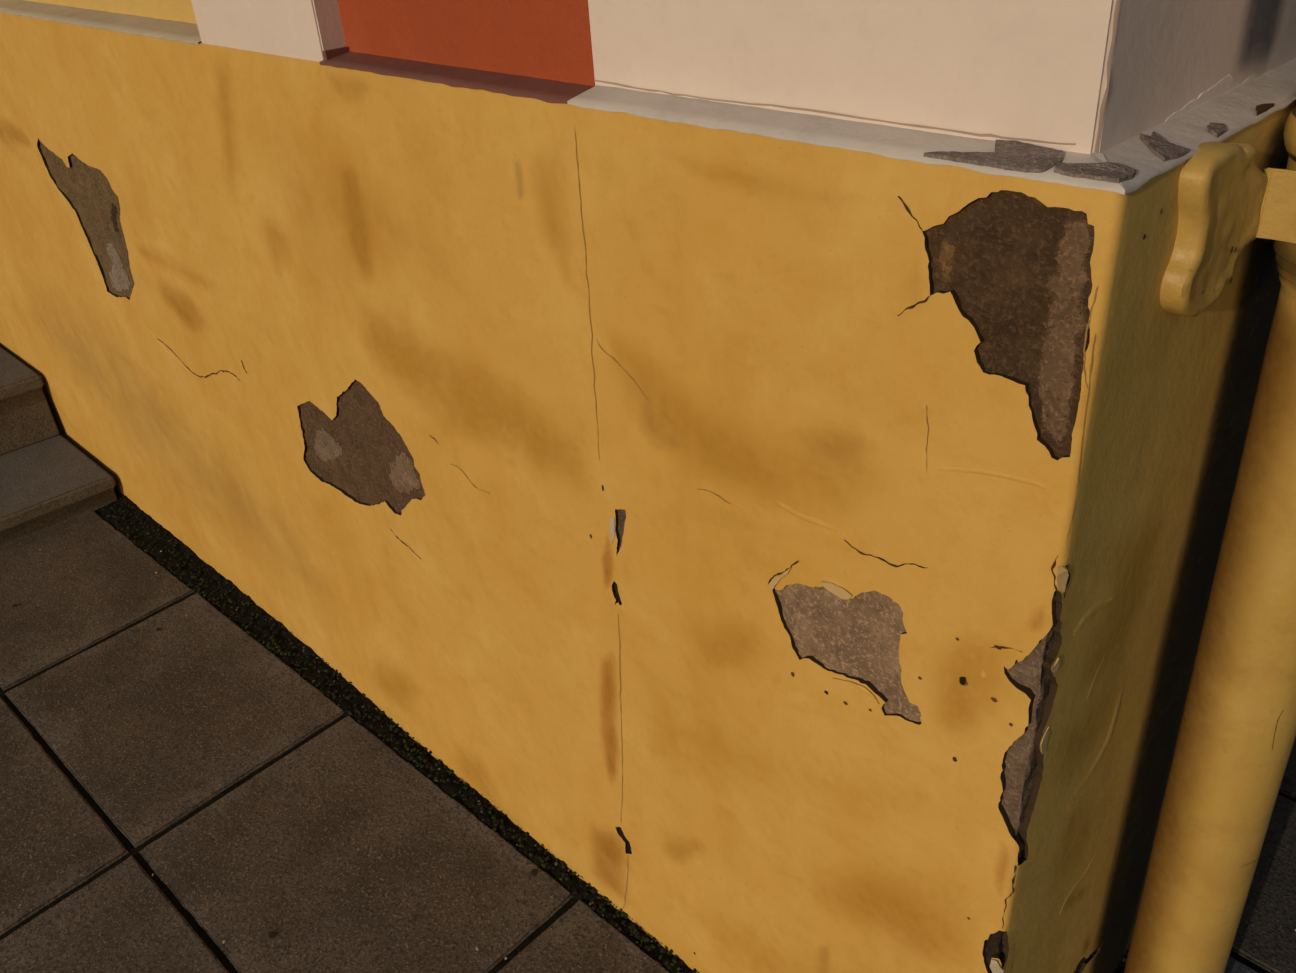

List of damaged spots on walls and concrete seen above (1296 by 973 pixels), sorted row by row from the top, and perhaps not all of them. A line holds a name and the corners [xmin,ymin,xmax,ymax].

spalling [39,140,135,298]
spalling [923,140,1136,183]
crack [156,338,247,380]
spalling [925,190,1094,458]
spalling [300,380,425,513]
spalling [610,509,626,550]
crack [844,540,925,568]
spalling [767,567,921,722]
spalling [1002,566,1069,859]
spalling [985,930,1004,973]